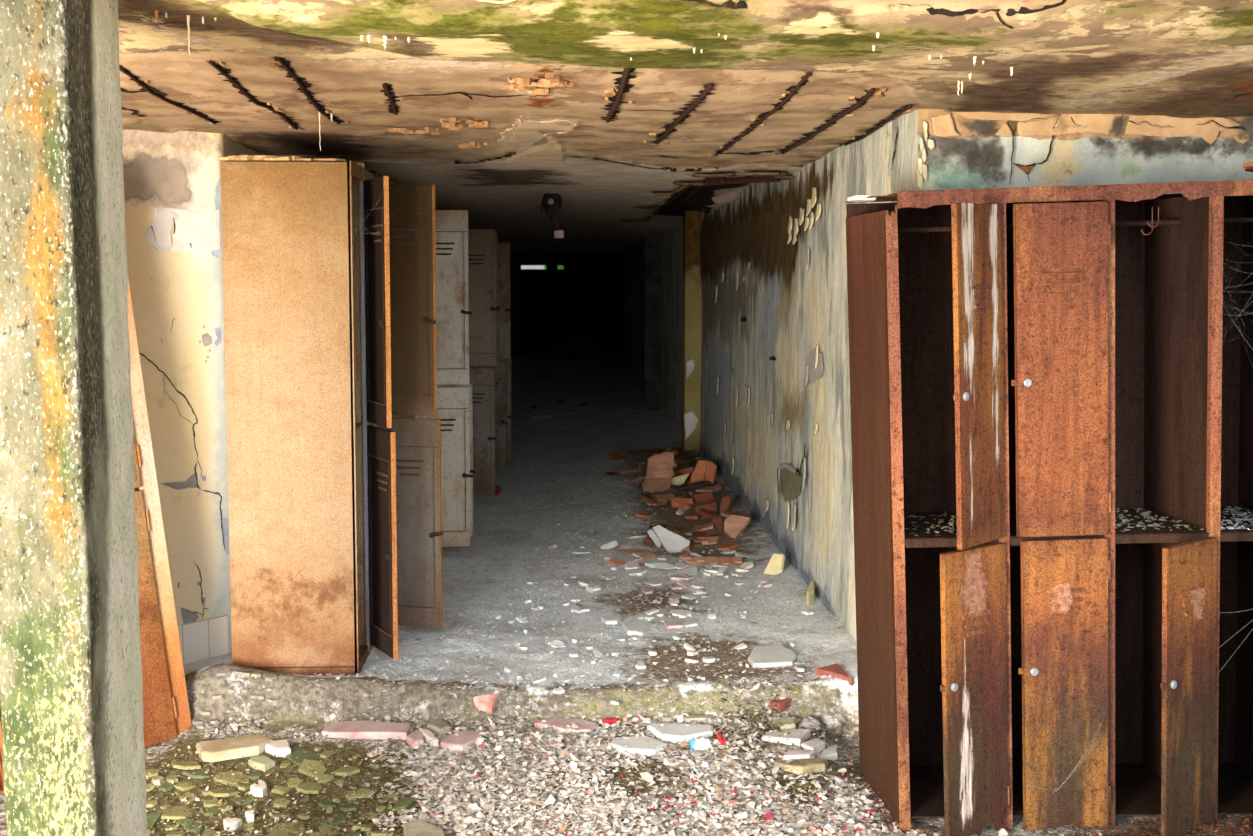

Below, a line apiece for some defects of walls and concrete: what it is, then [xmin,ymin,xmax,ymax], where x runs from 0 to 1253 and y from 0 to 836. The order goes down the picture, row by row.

spalling [119,65,221,124]
spalling [206,60,306,130]
spalling [269,57,351,125]